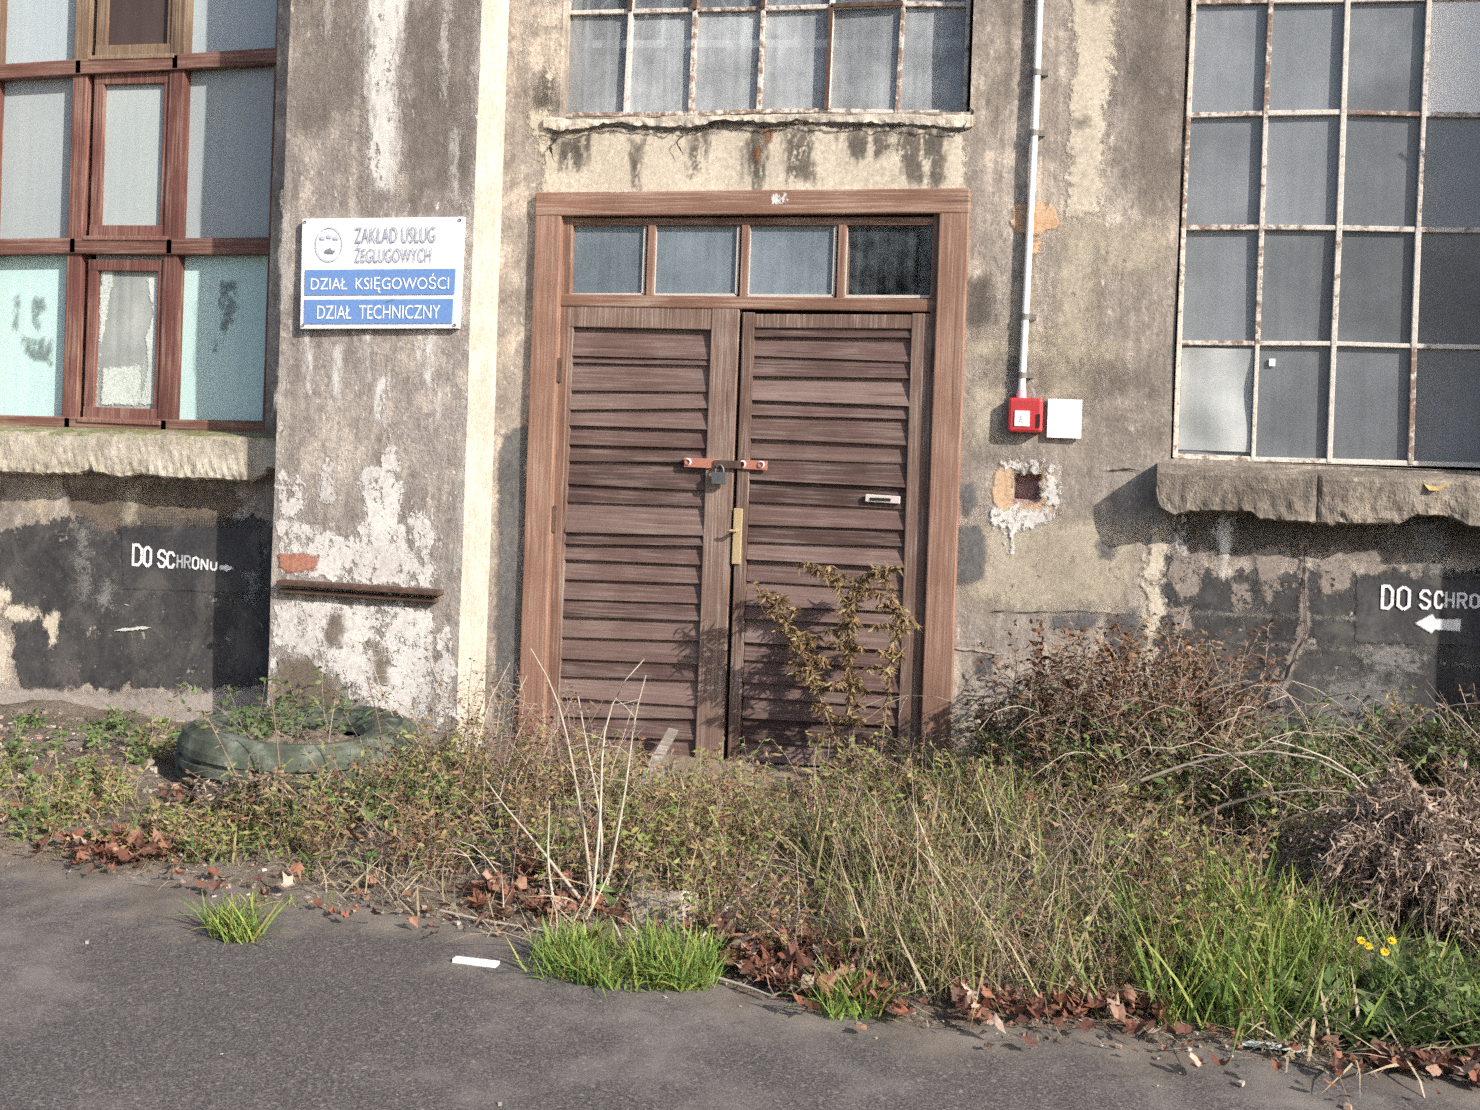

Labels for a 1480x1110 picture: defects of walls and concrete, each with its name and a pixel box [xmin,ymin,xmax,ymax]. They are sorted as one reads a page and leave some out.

corrosion [824,1,903,110]
water stain [551,134,591,170]
water stain [630,138,646,187]
water stain [690,129,711,175]
water stain [747,125,768,190]
water stain [785,122,816,180]
water stain [848,127,948,188]
flaking render [968,0,1164,399]
flaking render [969,384,1004,445]
peeling [0,431,465,731]
peeling [960,461,1480,786]